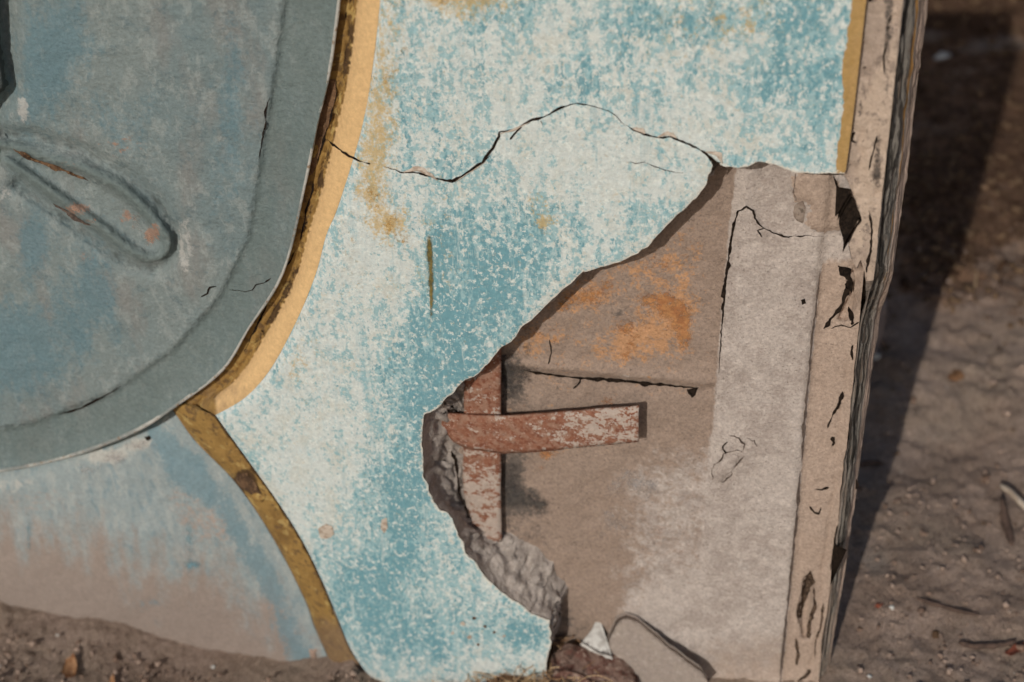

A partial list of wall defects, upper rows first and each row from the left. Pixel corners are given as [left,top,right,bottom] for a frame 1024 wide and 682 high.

crack [863,0,892,74]
crack [851,132,878,171]
crack [201,87,723,351]
crack [525,340,699,398]
crack [61,387,119,414]
flaking render [422,161,864,682]
crack [719,175,873,682]
crack [451,451,467,509]
crack [711,436,757,483]